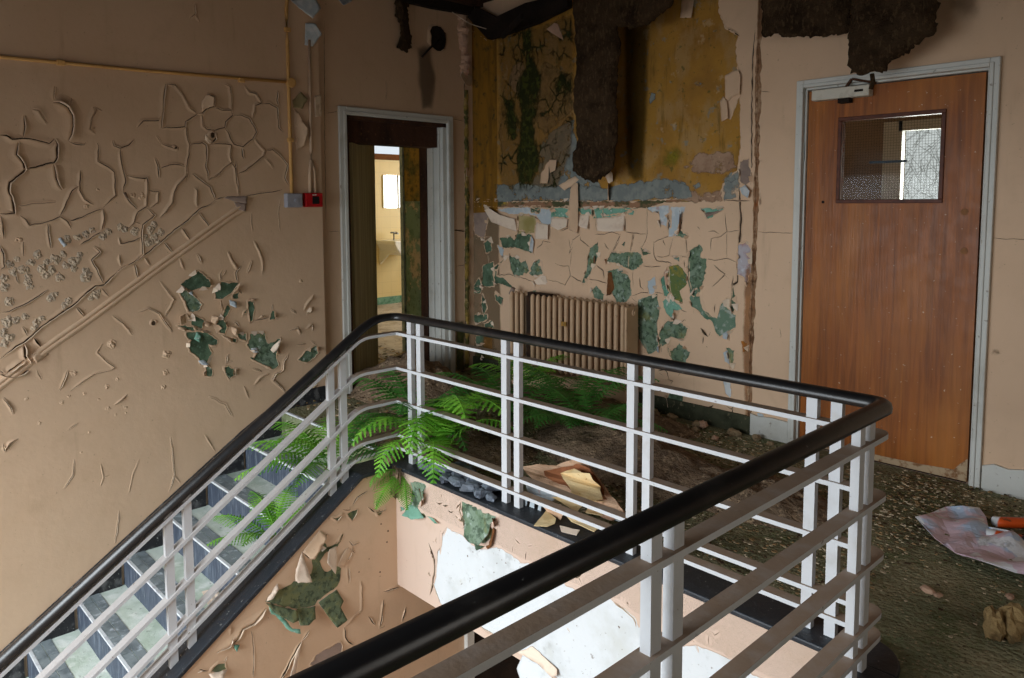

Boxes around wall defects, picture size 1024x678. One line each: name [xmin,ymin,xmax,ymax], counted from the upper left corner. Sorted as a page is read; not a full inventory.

peeling [421,0,767,417]